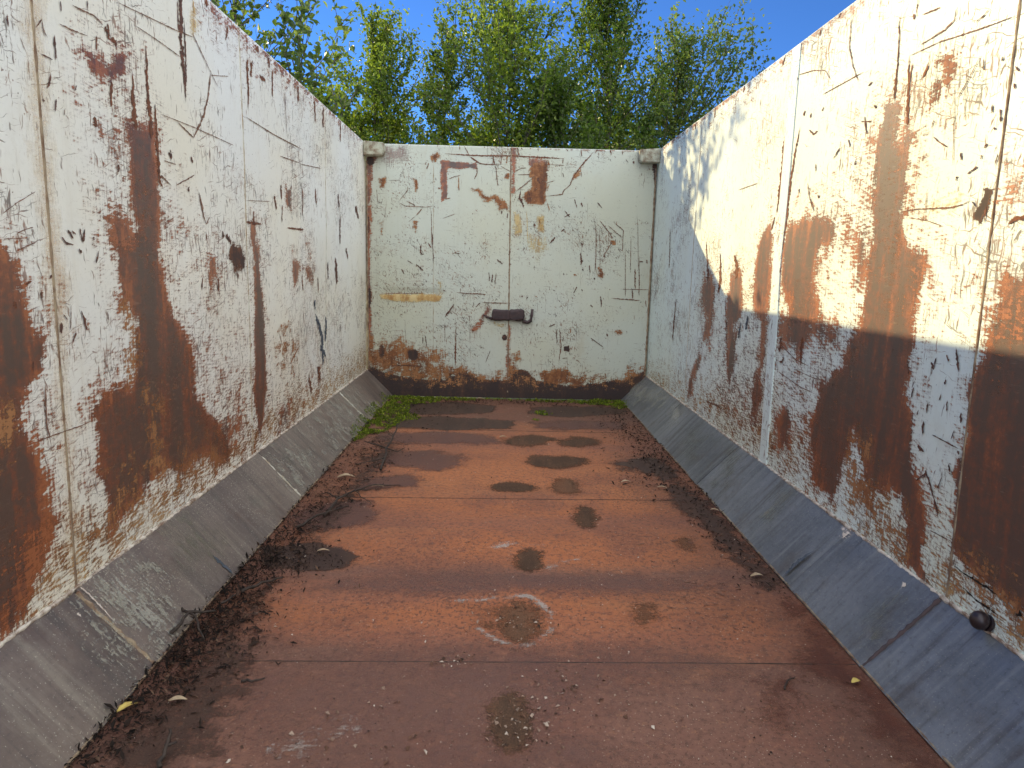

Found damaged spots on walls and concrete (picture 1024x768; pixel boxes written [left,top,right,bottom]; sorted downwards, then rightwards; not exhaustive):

rust [197,0,361,142]
rust [0,24,785,641]
rust [768,17,1024,651]